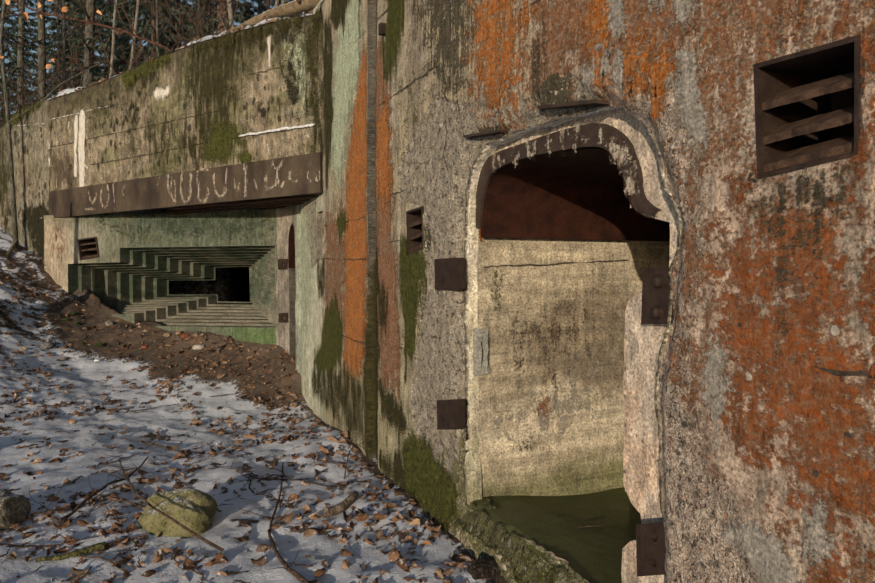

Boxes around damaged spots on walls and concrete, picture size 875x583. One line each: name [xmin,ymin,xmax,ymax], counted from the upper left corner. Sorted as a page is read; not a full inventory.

leakage [153,84,170,100]
leakage [48,110,320,249]
leakage [267,0,365,206]
rust [321,36,404,404]
crack [482,259,628,268]
rust [462,0,875,583]
crack [811,366,875,380]
leakage [440,427,525,583]